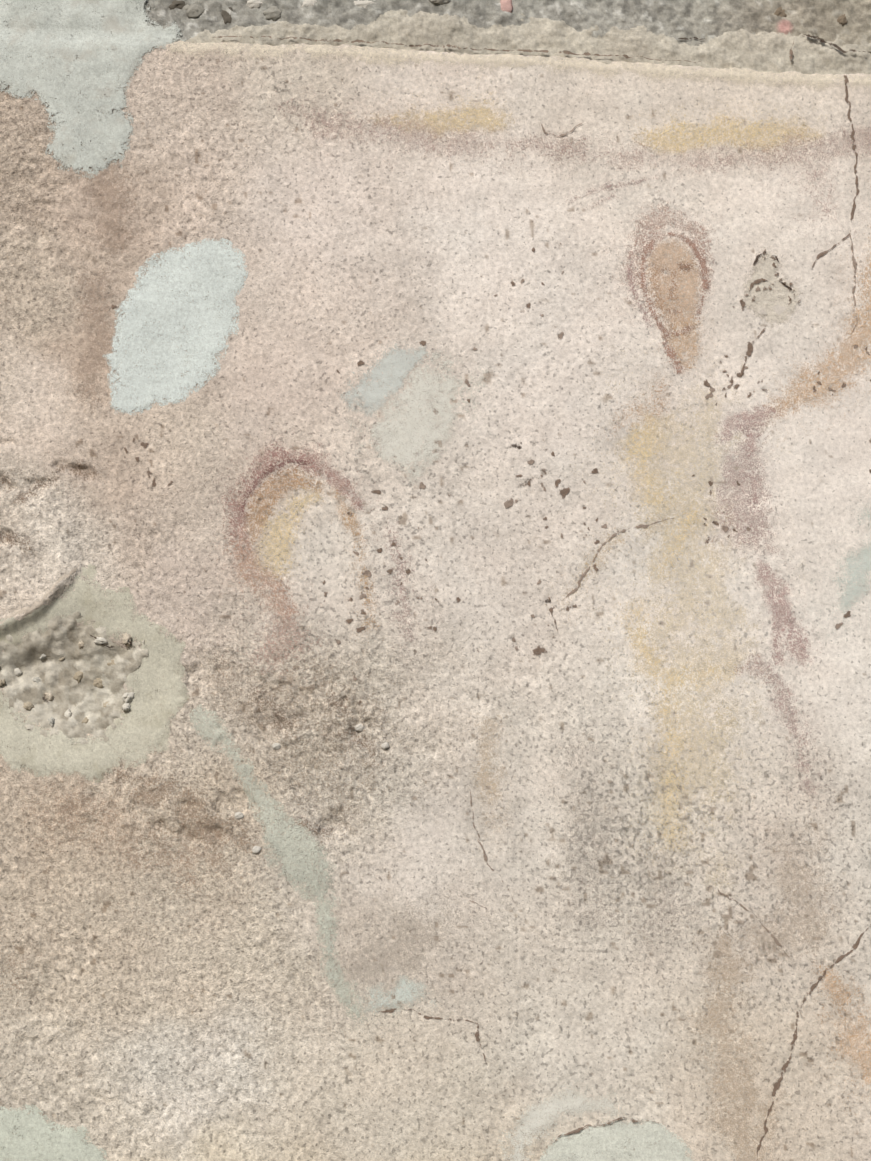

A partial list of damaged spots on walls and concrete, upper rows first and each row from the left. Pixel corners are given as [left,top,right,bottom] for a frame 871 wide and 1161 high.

crack [789,34,871,339]
spalling [0,448,116,565]
crack [718,889,789,957]
crack [757,929,867,1154]